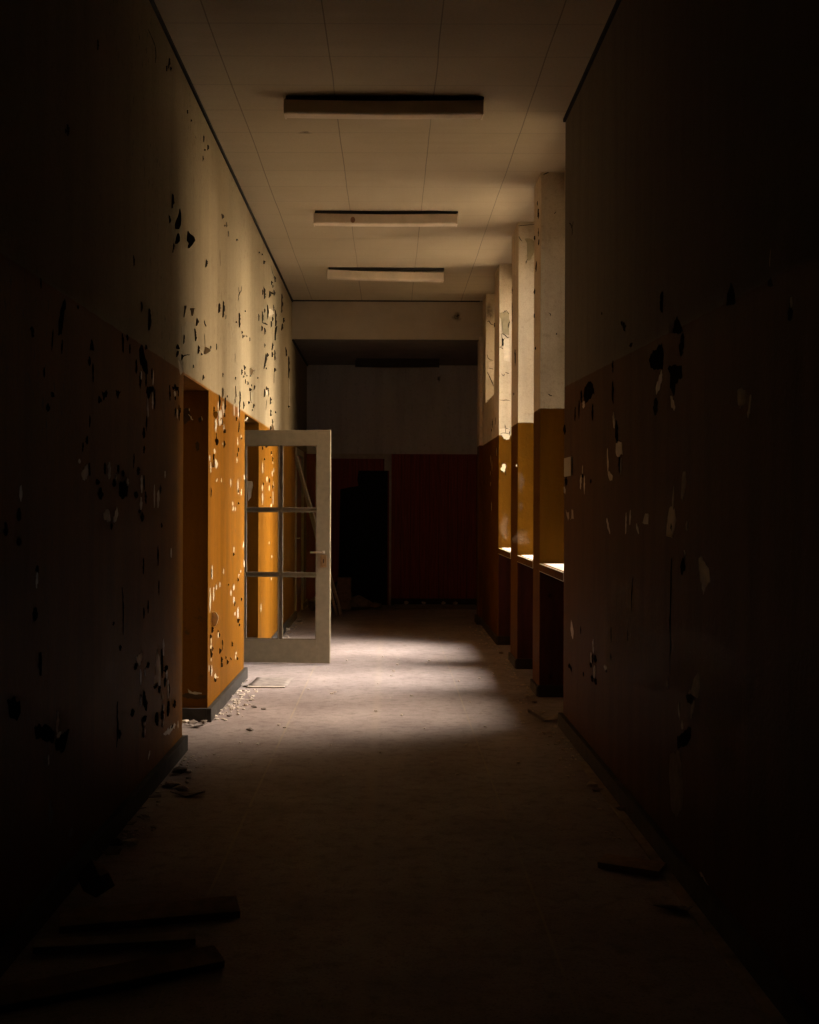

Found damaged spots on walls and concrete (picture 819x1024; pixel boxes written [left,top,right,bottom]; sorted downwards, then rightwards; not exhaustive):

peeling [169,194,195,253]
peeling [494,306,513,338]
peeling [169,252,290,511]
peeling [649,317,684,415]
peeling [209,542,245,626]
peeling [209,630,238,682]